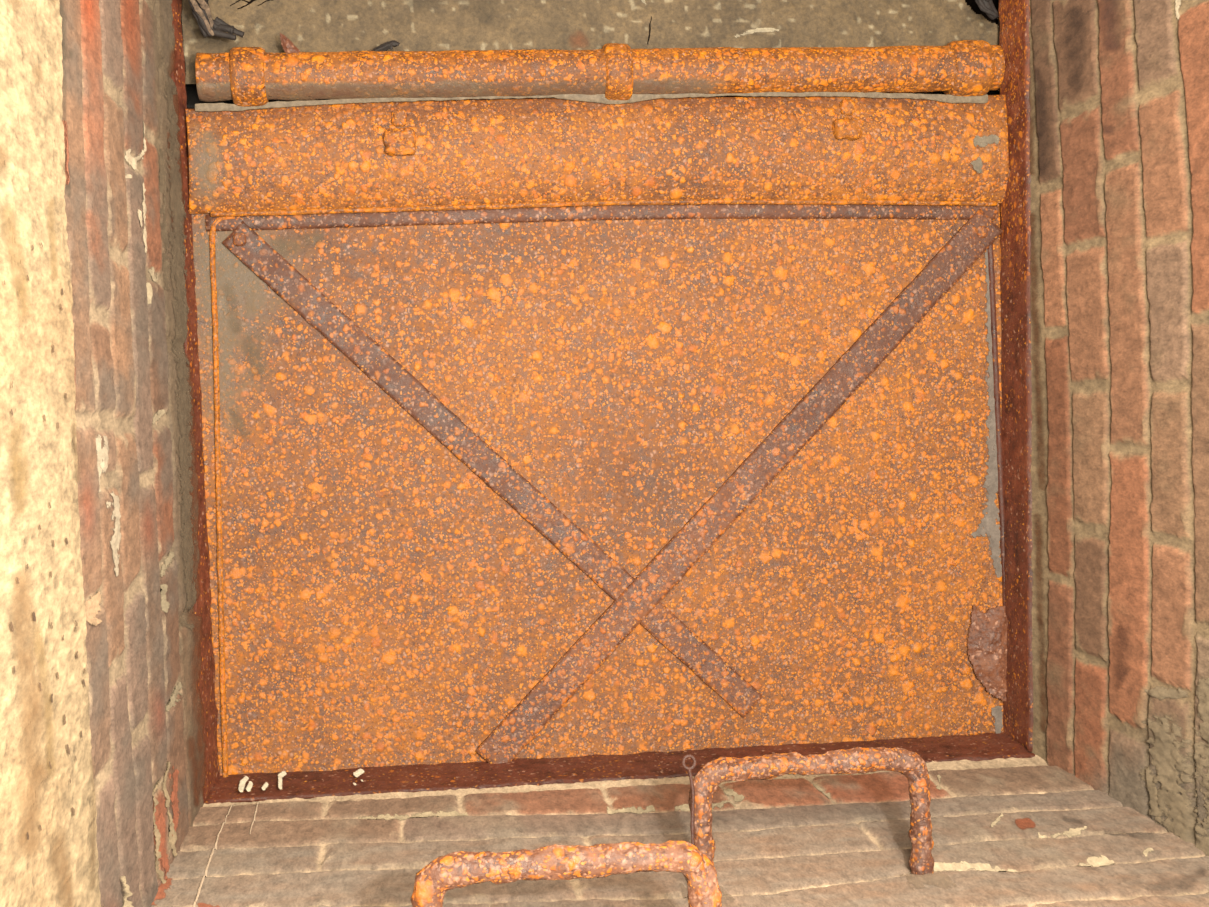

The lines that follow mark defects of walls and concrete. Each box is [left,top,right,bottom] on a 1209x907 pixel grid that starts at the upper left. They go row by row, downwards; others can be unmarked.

crack [230,0,270,9]
rust [967,605,1008,701]